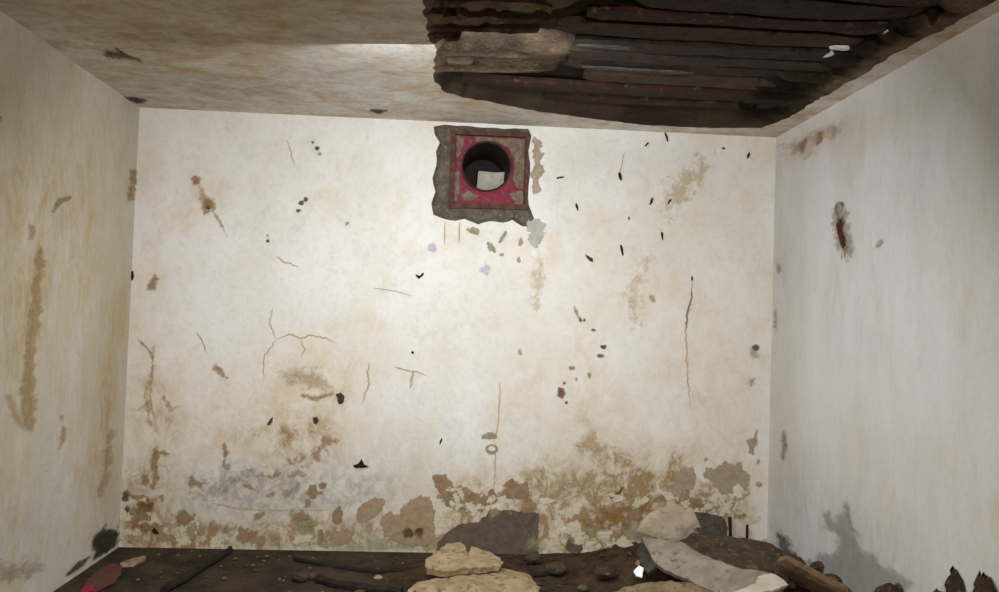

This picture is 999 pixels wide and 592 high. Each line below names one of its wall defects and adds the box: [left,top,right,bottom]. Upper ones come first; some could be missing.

water stain [106,48,139,59]
spalling [422,0,996,128]
water stain [14,249,45,429]
crack [262,308,334,375]
crack [685,287,693,407]
water stain [151,449,168,489]
peeling [119,460,280,549]
water stain [288,437,336,467]
water stain [482,432,498,454]
peeling [263,430,762,554]
water stain [777,533,796,555]